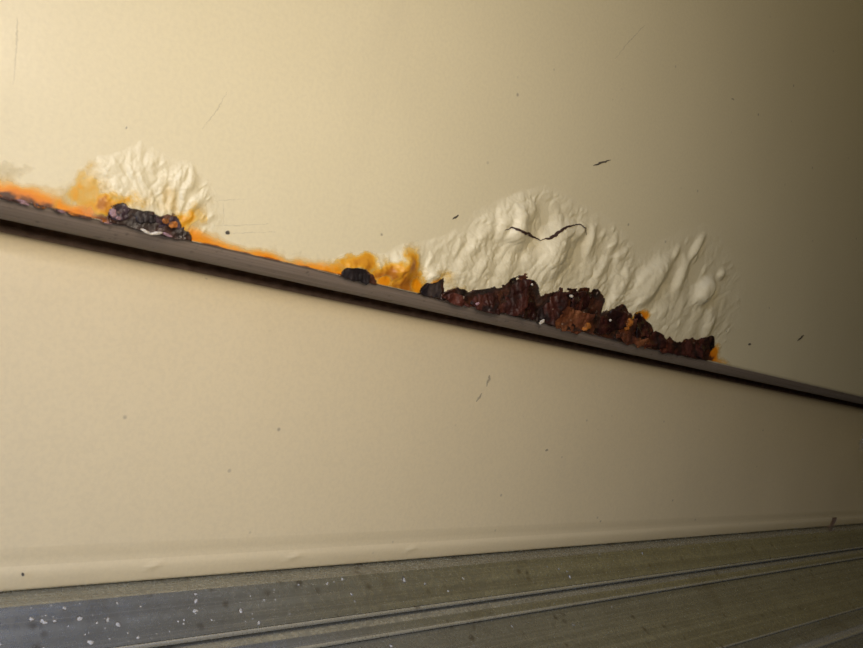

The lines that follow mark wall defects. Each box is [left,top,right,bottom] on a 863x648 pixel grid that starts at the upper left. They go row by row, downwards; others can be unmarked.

rust [0,173,721,363]
crack [506,224,587,241]